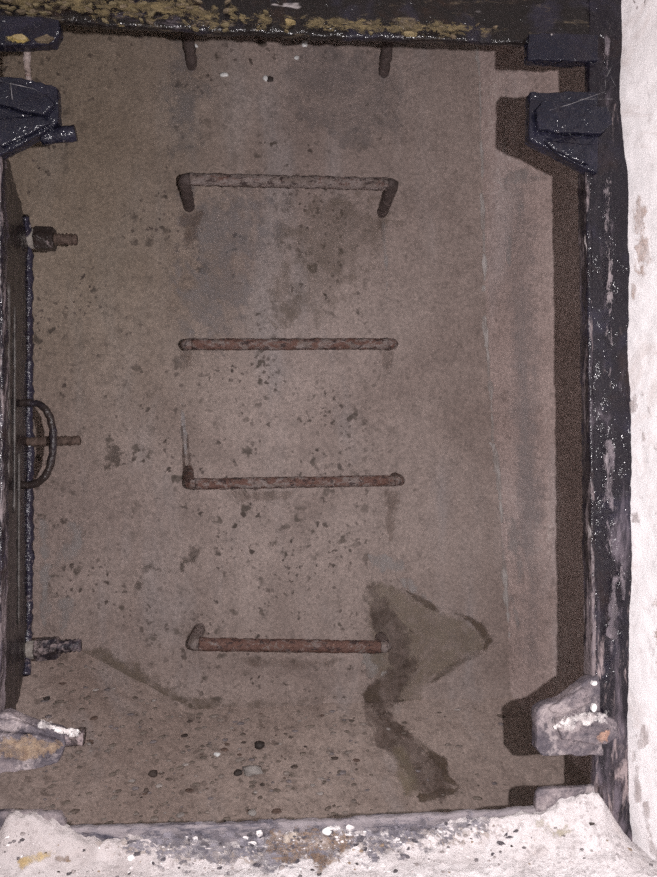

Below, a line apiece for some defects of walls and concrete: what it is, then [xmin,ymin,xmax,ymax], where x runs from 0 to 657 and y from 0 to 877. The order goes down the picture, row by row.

leakage [363,554,492,802]